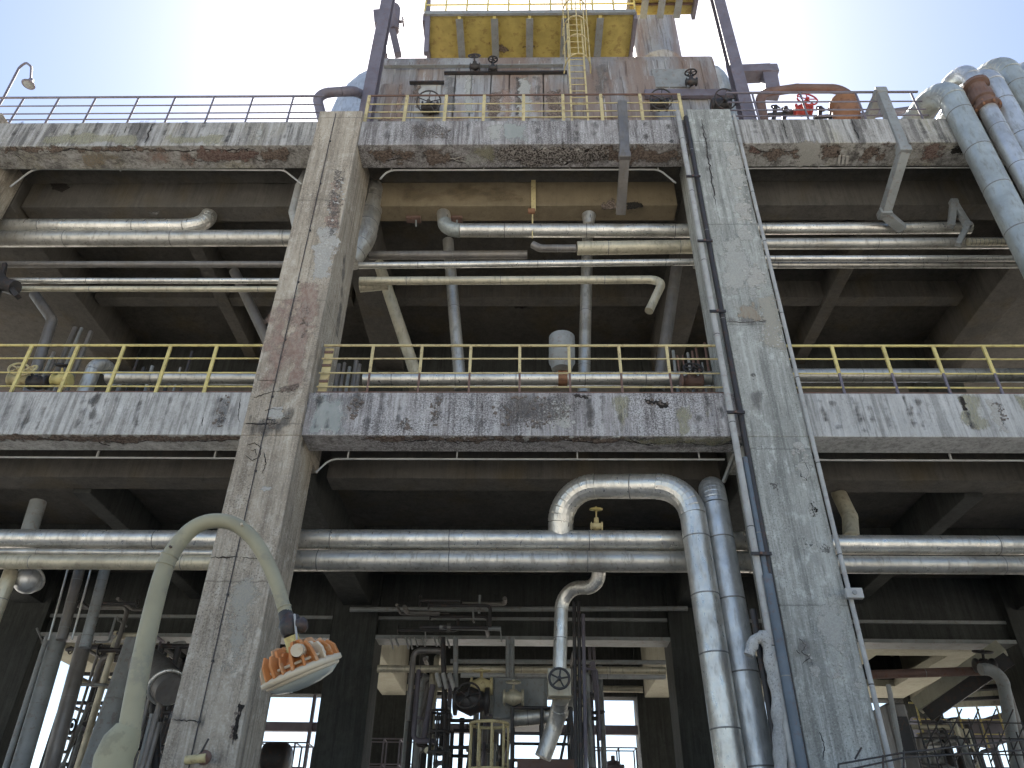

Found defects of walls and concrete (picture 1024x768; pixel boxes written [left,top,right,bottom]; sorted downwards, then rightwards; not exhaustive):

crack [701,119,716,205]
rust [858,142,893,163]
rust [920,143,946,162]
leakage [958,394,1009,433]